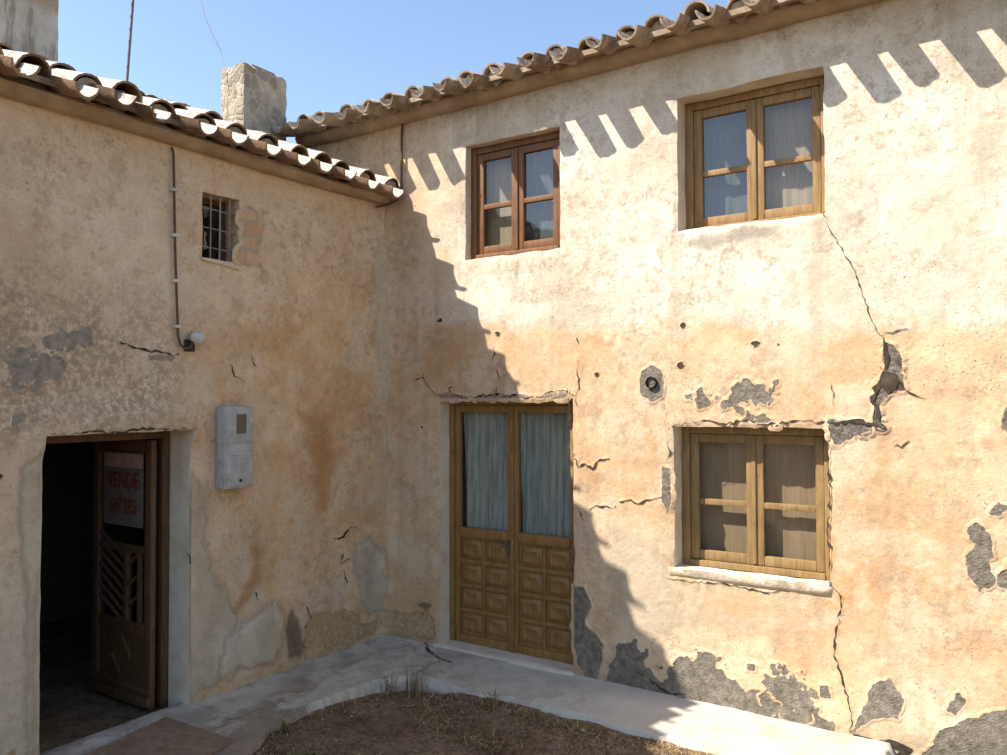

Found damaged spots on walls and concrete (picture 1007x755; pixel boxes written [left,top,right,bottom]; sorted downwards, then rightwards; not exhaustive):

spalling [0,323,97,434]
crack [120,339,179,356]
crack [414,347,610,470]
spalling [637,362,668,405]
spalling [681,374,783,431]
spalling [878,371,900,394]
spalling [658,464,676,515]
crack [666,211,924,755]
crack [570,495,662,590]
spalling [962,499,1007,597]
spalling [569,581,908,735]
spalling [910,689,1007,755]